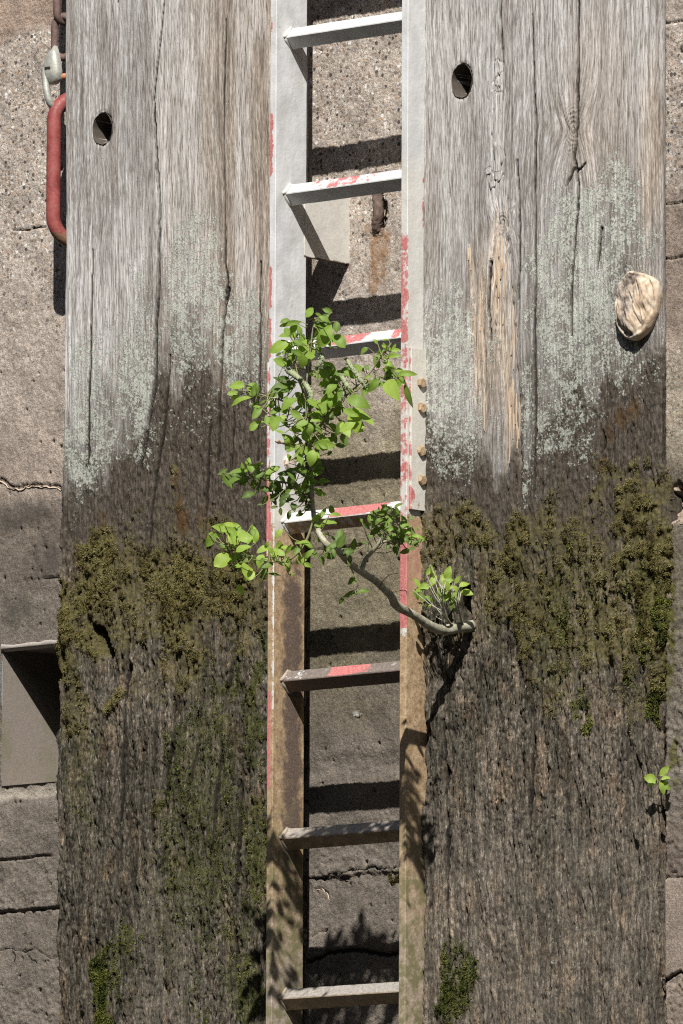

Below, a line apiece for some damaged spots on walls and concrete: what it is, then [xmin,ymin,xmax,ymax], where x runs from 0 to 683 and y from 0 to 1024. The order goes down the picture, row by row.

crack [0,478,62,490]
crack [303,866,396,899]